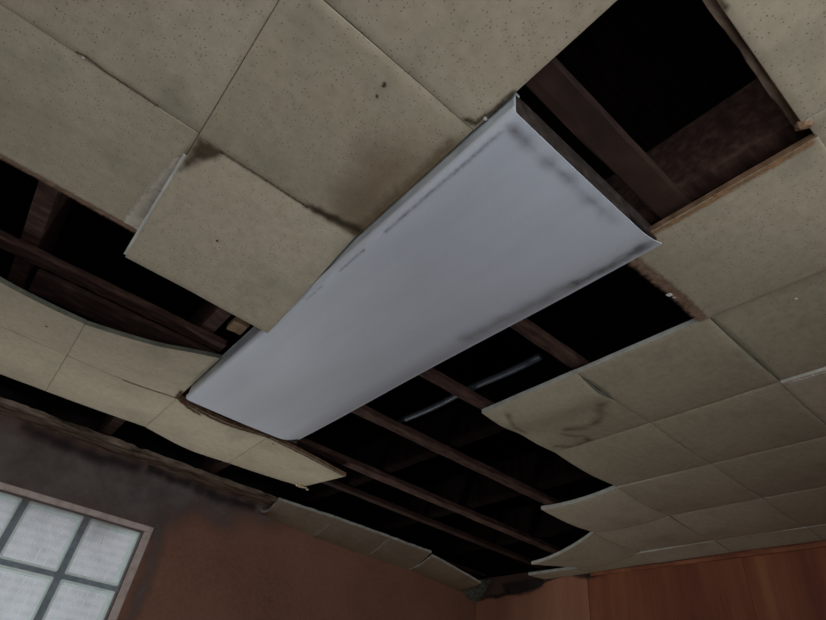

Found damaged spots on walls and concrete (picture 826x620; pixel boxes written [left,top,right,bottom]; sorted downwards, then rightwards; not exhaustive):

spalling [794,119,814,131]
peeling [0,154,181,232]
water stain [185,139,359,231]
spalling [629,258,706,320]